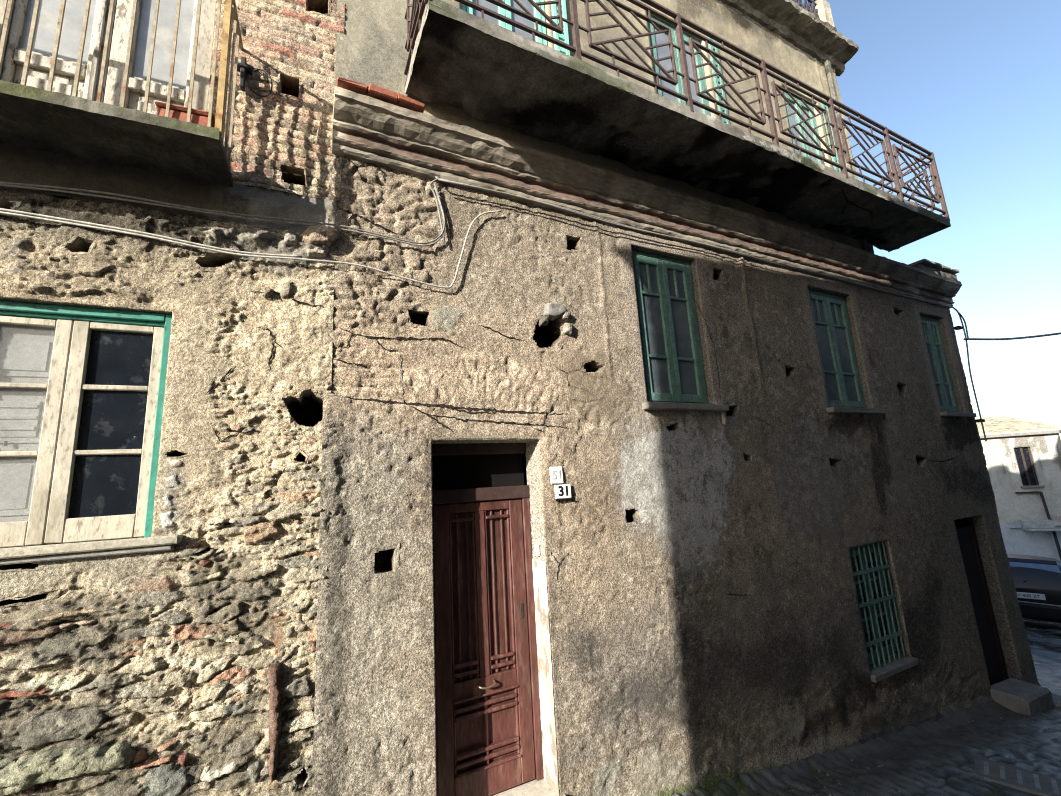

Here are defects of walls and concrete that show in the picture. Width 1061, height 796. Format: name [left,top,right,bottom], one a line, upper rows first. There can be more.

crack [251,291,322,306]
crack [260,327,281,370]
crack [334,327,609,433]
hole [0,562,50,572]
spalling [155,447,278,653]
spalling [0,589,139,670]
spalling [0,682,262,796]
spalling [290,763,311,788]